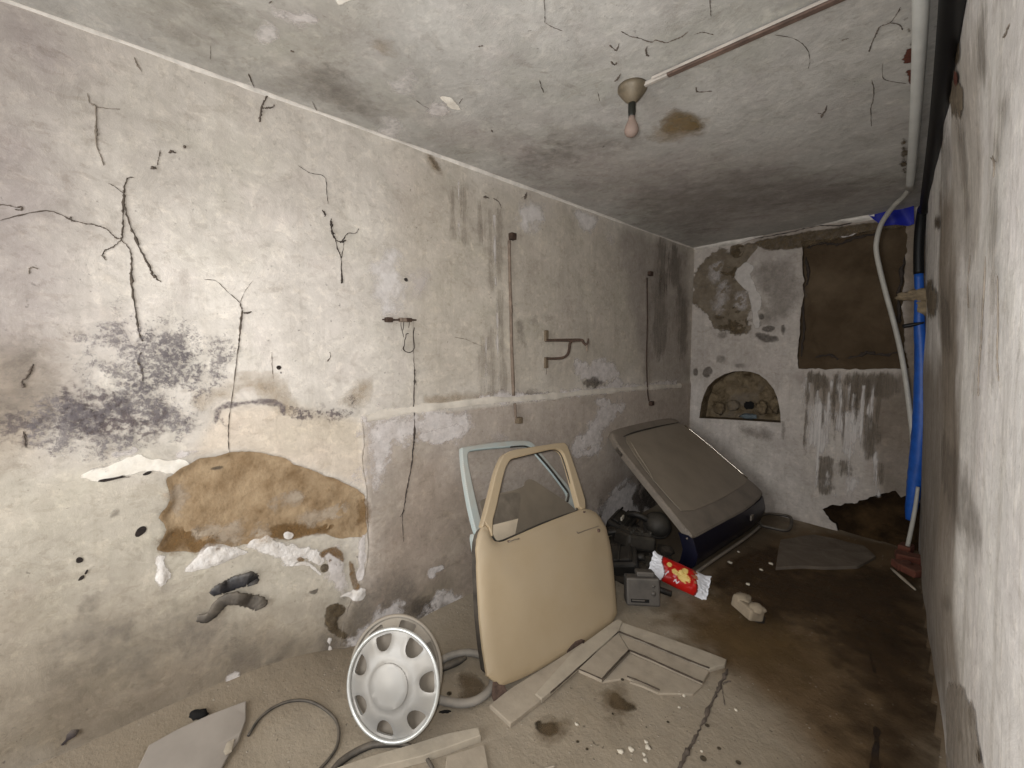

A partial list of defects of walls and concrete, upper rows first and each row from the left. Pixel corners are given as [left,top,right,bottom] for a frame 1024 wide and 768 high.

crack [87,93,109,166]
crack [0,204,119,260]
spalling [692,243,762,335]
crack [20,364,34,388]
damp [0,320,235,459]
crack [400,341,416,542]
damp [801,371,897,496]
spalling [157,451,368,590]
crack [678,669,731,768]